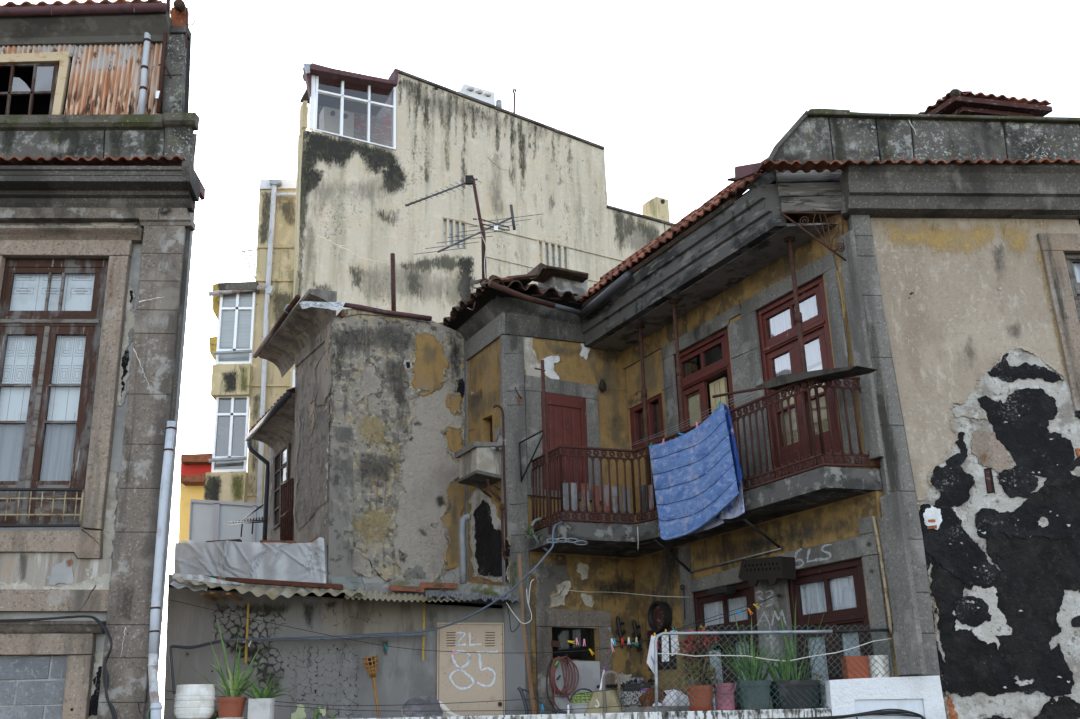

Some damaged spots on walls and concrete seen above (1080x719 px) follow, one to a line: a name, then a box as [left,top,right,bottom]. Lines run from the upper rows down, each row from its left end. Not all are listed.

leakage [260,130,406,324]
leakage [614,211,659,249]
leakage [403,254,475,304]
peeling [520,336,562,380]
spalling [579,343,592,361]
flaking render [103,470,120,559]
spalling [390,333,511,584]
spalling [916,345,1080,649]
flaking render [0,557,111,590]
spalling [530,561,596,609]
spalling [927,563,945,677]
spalling [943,590,1080,719]